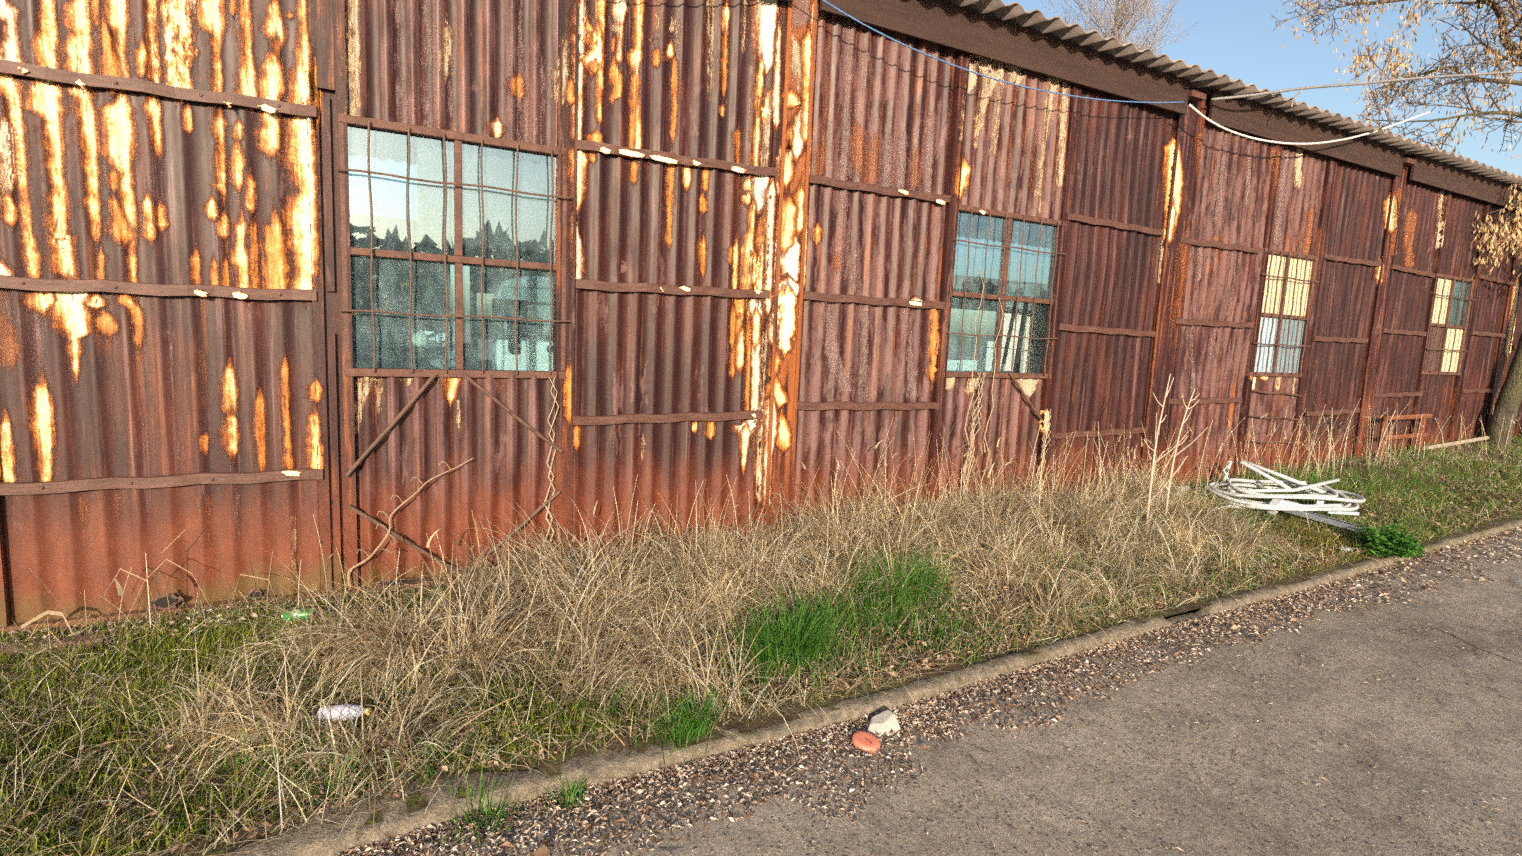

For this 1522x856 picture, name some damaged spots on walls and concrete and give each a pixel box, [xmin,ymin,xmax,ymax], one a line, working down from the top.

peeling [0,0,322,384]
peeling [485,0,709,284]
corrosion [663,146,677,249]
peeling [691,0,819,511]
peeling [883,55,1025,205]
corrosion [1029,76,1069,216]
corrosion [1161,135,1184,246]
corrosion [1373,188,1417,284]
corrosion [91,293,145,349]
peeling [0,371,57,482]
peeling [218,356,241,463]
corrosion [251,354,295,472]